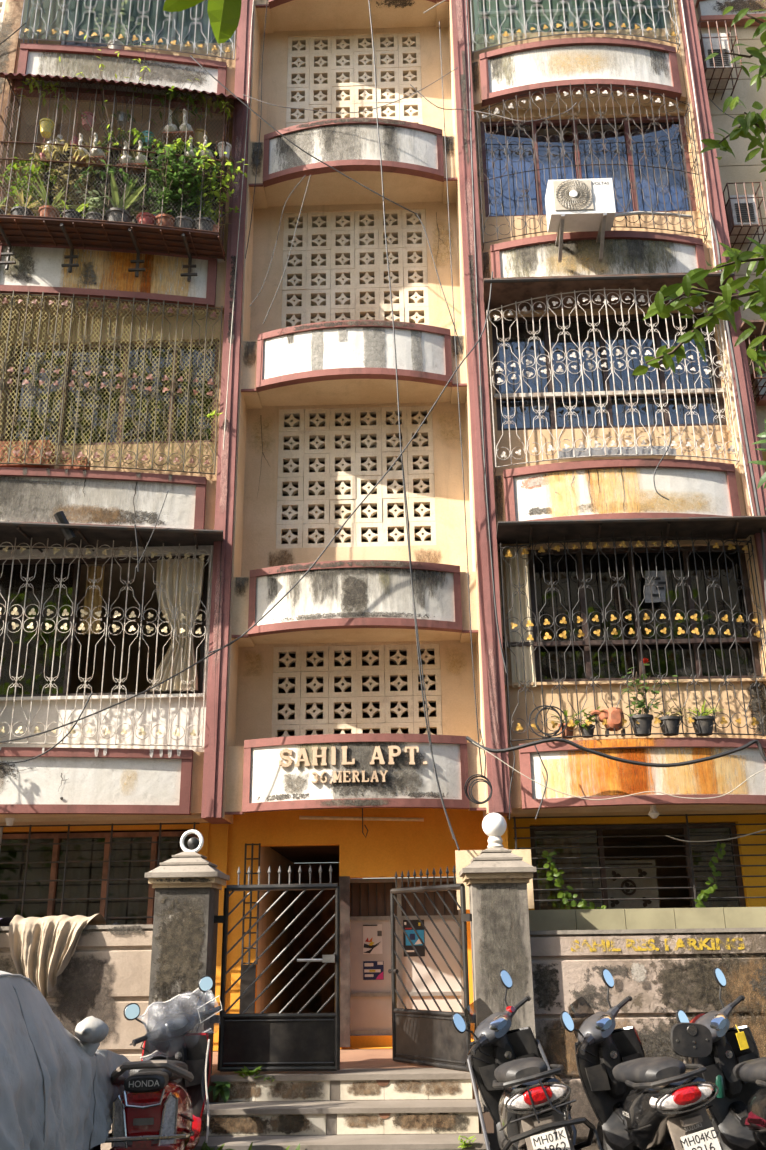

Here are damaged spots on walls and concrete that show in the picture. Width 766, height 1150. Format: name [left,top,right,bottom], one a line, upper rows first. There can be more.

damp [443,51,515,162]
damp [276,118,409,170]
corrosion [63,248,189,296]
damp [452,252,490,359]
damp [505,239,675,277]
damp [0,468,165,526]
corrosion [548,468,639,517]
damp [267,551,446,623]
corrosion [541,738,747,798]
damp [52,955,118,1042]
damp [108,896,205,1033]
damp [538,1020,599,1139]